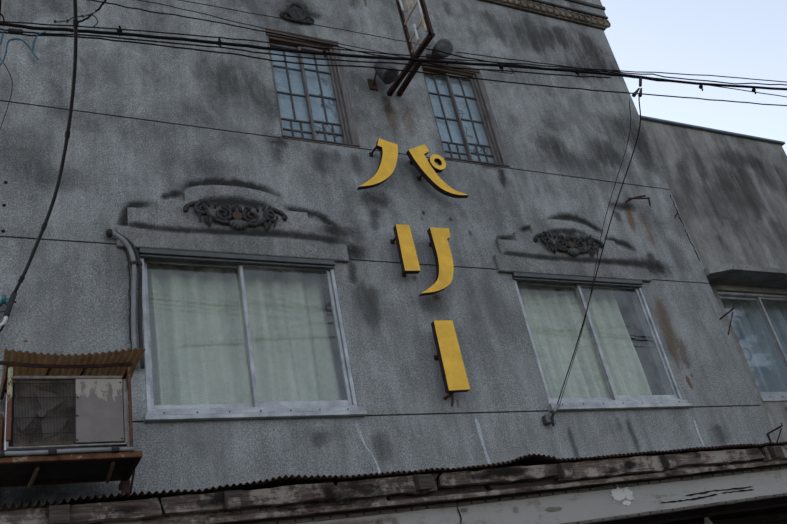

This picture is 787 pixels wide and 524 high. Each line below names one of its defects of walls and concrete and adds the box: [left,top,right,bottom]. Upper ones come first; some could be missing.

corrosion [657,301,678,361]
peeling [610,484,636,506]